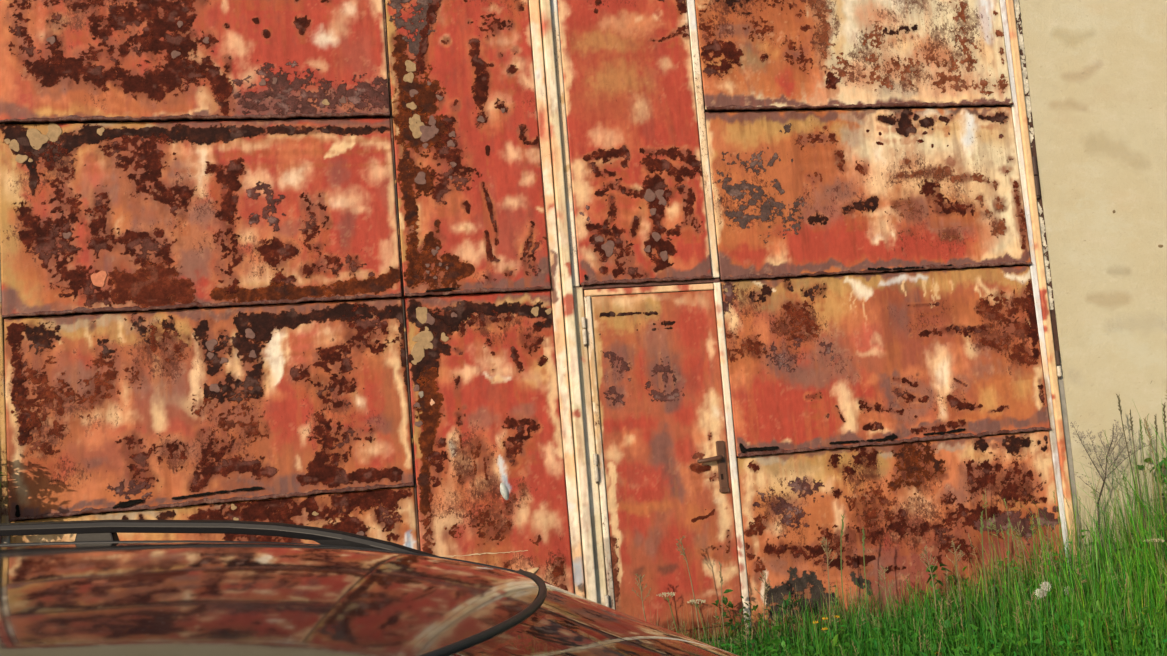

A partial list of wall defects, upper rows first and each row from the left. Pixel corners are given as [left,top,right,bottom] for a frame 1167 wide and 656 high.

corrosion [653,0,1008,96]
corrosion [877,109,953,137]
corrosion [978,108,1008,124]
corrosion [579,123,869,279]
corrosion [842,156,1027,249]
corrosion [0,0,553,555]
corrosion [723,278,838,373]
corrosion [744,377,1060,626]
corrosion [552,557,568,591]